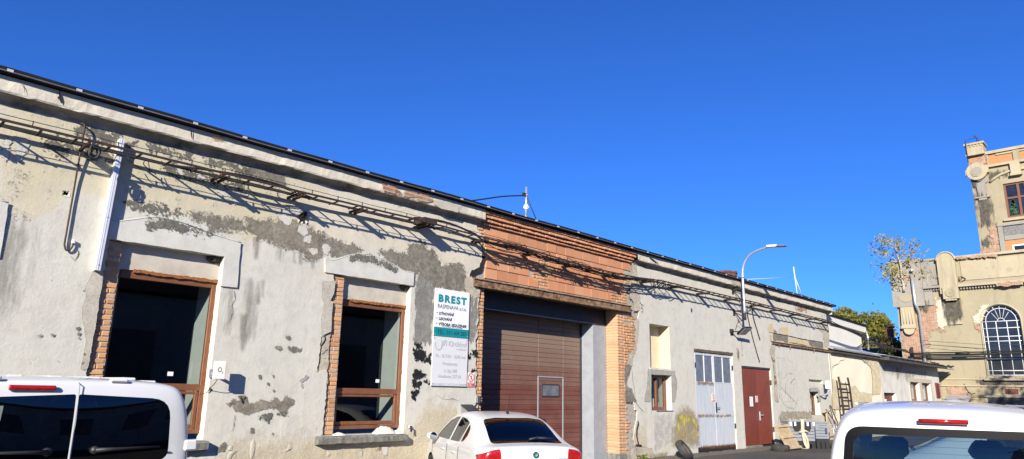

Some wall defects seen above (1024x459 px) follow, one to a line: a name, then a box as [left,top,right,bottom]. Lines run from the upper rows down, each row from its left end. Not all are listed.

leakage [971,180,995,227]
flaking render [1,125,480,373]
leakage [942,298,963,324]
flaking render [233,375,294,436]
peeling [411,369,430,401]